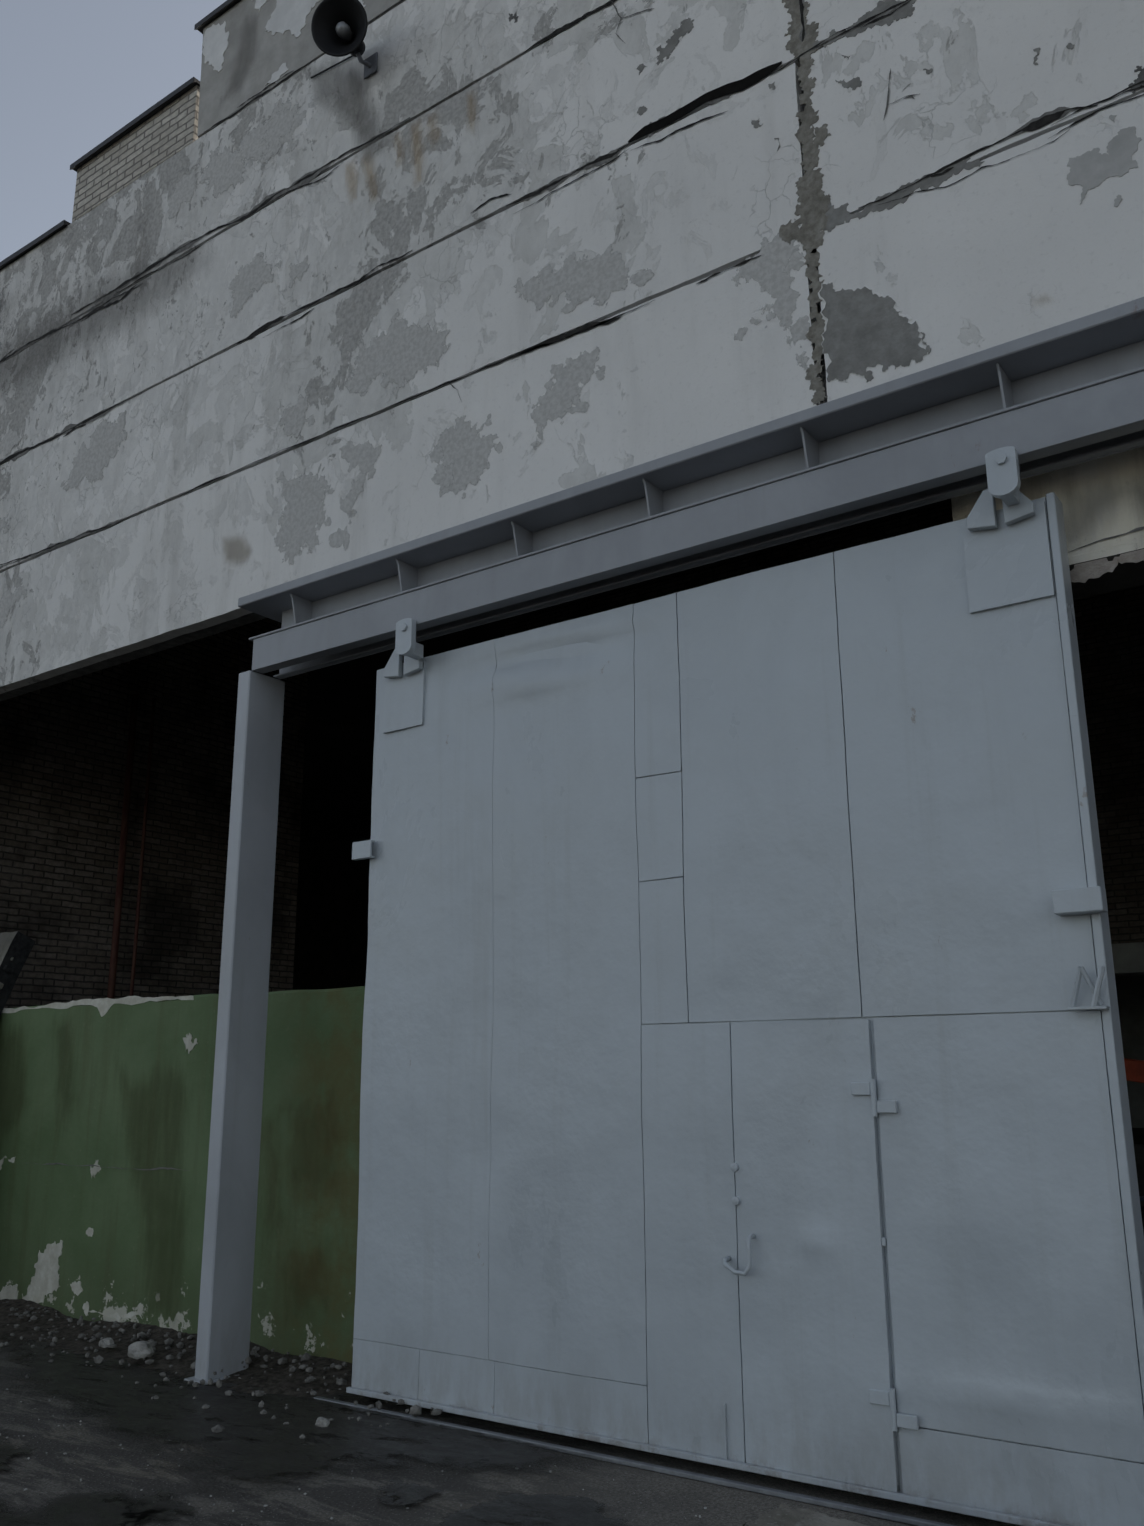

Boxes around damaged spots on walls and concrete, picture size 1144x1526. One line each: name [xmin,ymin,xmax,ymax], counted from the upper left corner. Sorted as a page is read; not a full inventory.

crack [0,117,412,363]
crack [205,63,310,132]
crack [471,0,911,213]
peeling [732,0,985,405]
crack [884,69,918,118]
crack [858,80,1144,209]
peeling [1066,115,1142,207]
crack [0,300,654,568]
peeling [429,414,503,499]
peeling [530,347,606,450]
spalling [1070,549,1144,583]
peeling [0,1240,144,1322]